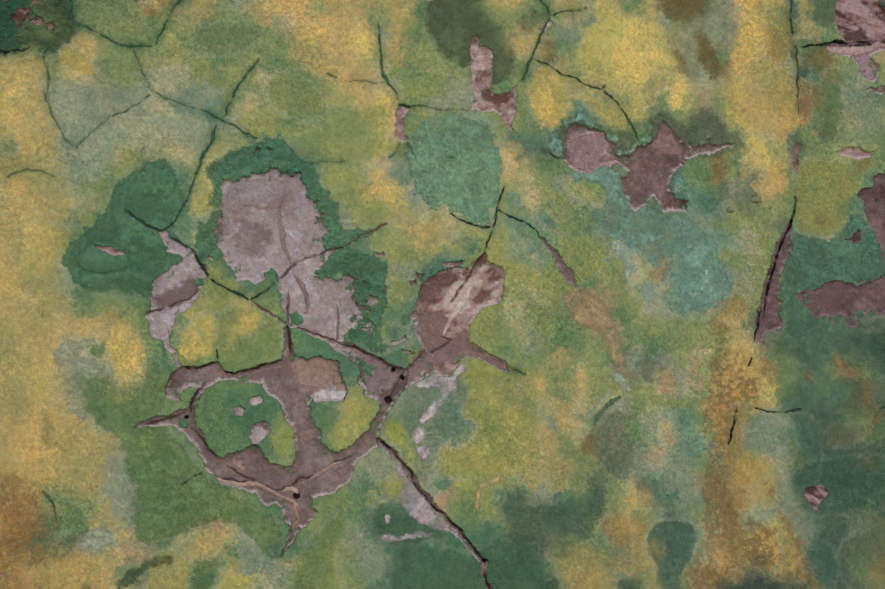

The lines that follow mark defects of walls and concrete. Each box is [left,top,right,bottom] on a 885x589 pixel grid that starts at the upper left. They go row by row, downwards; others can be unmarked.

crack [327,34,422,108]
peeling [470,36,517,133]
crack [521,0,637,137]
peeling [825,0,885,95]
crack [129,61,452,397]
crack [450,187,535,302]
peeling [563,121,734,213]
peeling [753,220,793,344]
peeling [857,171,885,262]
peeling [134,168,508,589]
crack [147,391,313,491]
crack [381,441,491,589]